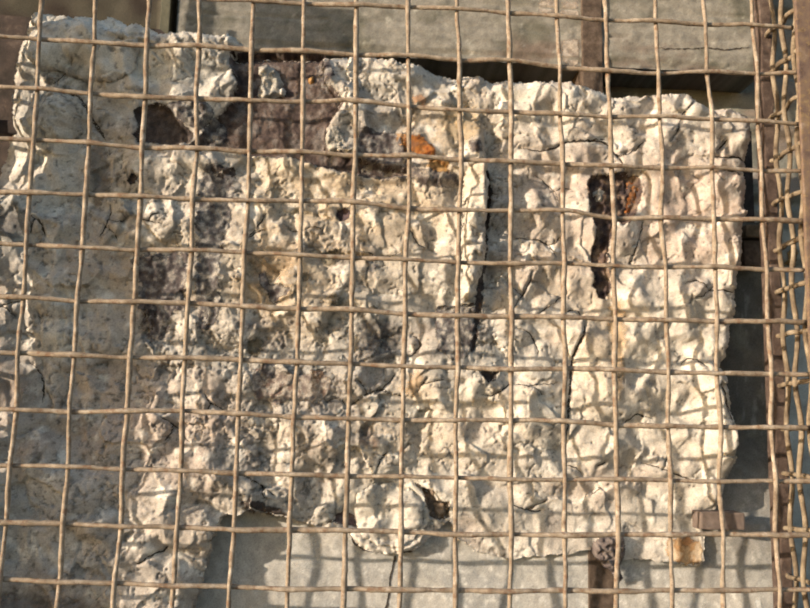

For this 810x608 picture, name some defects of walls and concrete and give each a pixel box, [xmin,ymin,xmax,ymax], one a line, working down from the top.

spalling [132,51,459,188]
corrosion [396,133,449,172]
crack [520,138,645,164]
crack [715,140,742,174]
spalling [130,163,237,343]
crack [437,170,493,352]
spalling [587,171,643,299]
crack [687,280,732,297]
spalling [250,364,331,407]
spalling [423,488,450,520]
crack [350,535,412,608]
corrosion [666,537,703,565]